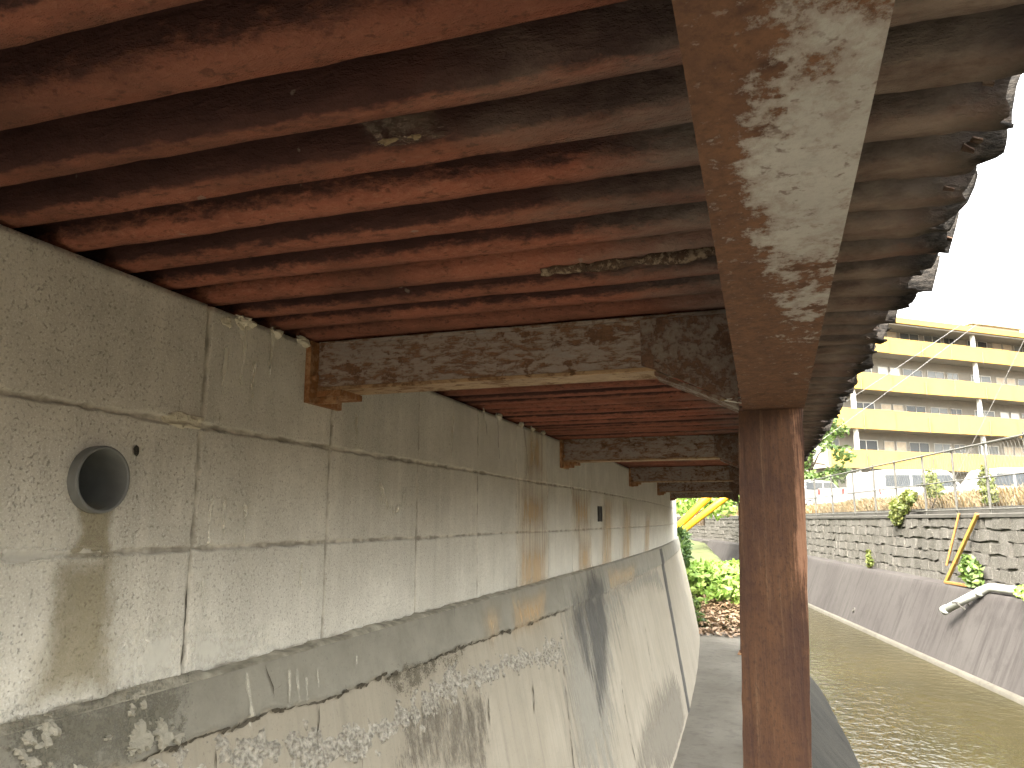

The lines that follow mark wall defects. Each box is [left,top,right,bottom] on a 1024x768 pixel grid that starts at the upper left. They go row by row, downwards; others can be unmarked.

peeling [540,247,716,276]
peeling [0,712,62,768]
peeling [125,690,207,768]
spalling [206,633,567,768]
damp [563,569,662,768]